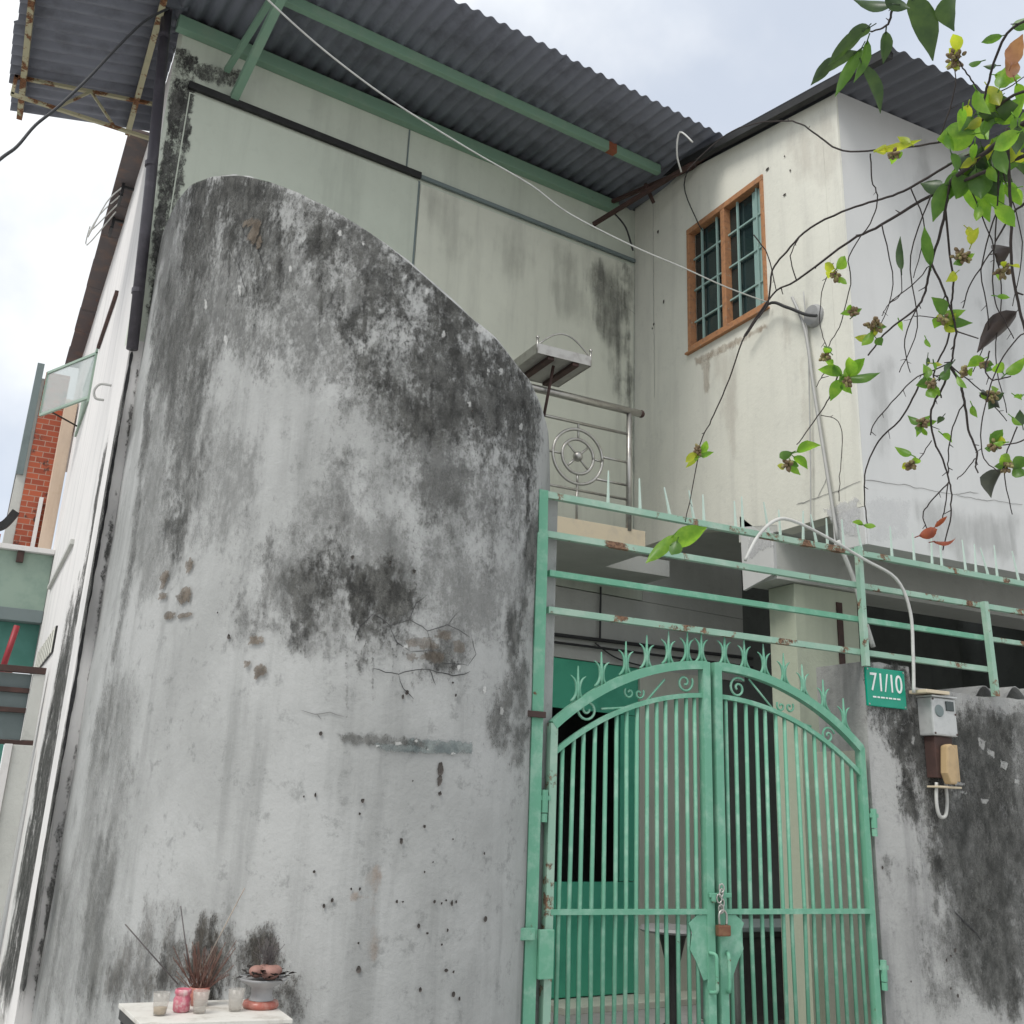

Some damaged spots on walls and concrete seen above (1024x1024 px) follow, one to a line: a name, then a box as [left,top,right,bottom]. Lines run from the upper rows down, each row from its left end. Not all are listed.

leakage [597,265,626,353]
leakage [146,48,540,795]
flaking render [158,570,192,619]
crack [355,595,476,699]
peeling [342,732,473,796]
leakage [865,662,1024,1023]